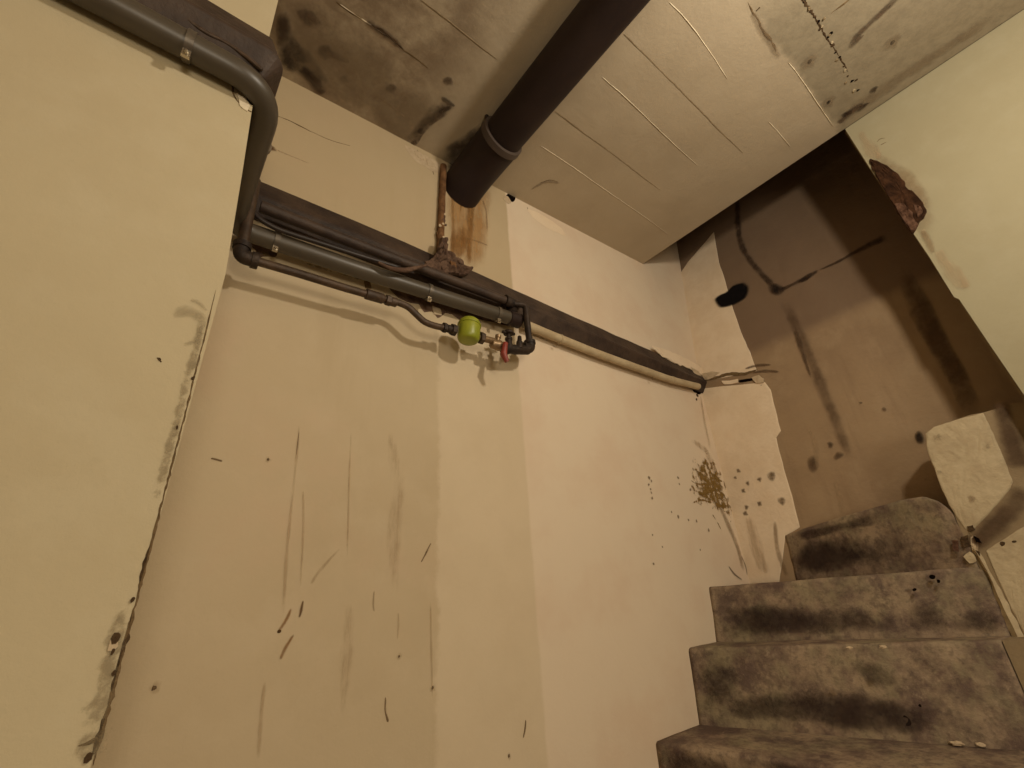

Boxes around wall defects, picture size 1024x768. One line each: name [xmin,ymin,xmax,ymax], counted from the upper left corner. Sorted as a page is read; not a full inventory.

mould [278,18,349,94]
crack [801,0,860,92]
water stain [852,2,894,45]
water stain [411,97,454,145]
water stain [839,103,868,123]
spalling [869,159,927,234]
rust [424,199,484,277]
spalling [652,346,778,401]